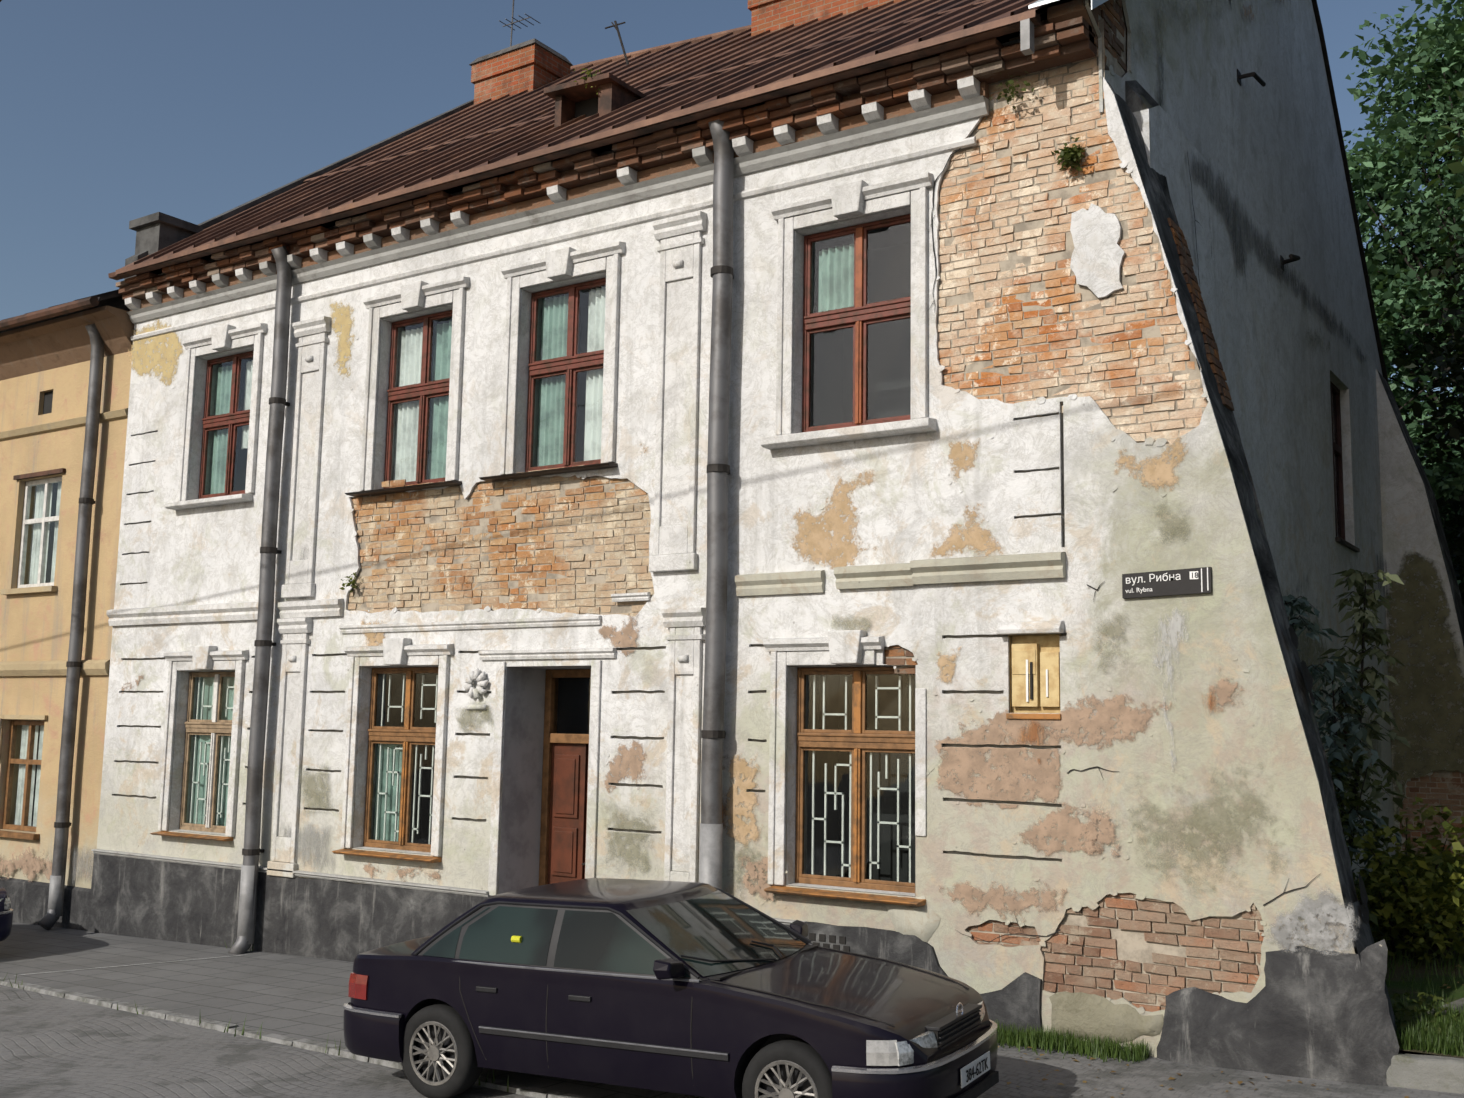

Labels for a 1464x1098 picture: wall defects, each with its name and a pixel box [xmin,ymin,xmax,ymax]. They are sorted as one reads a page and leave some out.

flaking render [935,0,1235,497]
damp [1193,157,1367,361]
peeling [128,320,183,388]
peeling [330,302,359,390]
flaking render [347,465,654,656]
peeling [792,472,876,570]
peeling [932,435,1020,558]
peeling [604,741,646,793]
peeling [722,756,788,908]
peeling [926,686,1173,860]
flaking render [1396,770,1464,858]
flaking render [939,873,1369,1014]